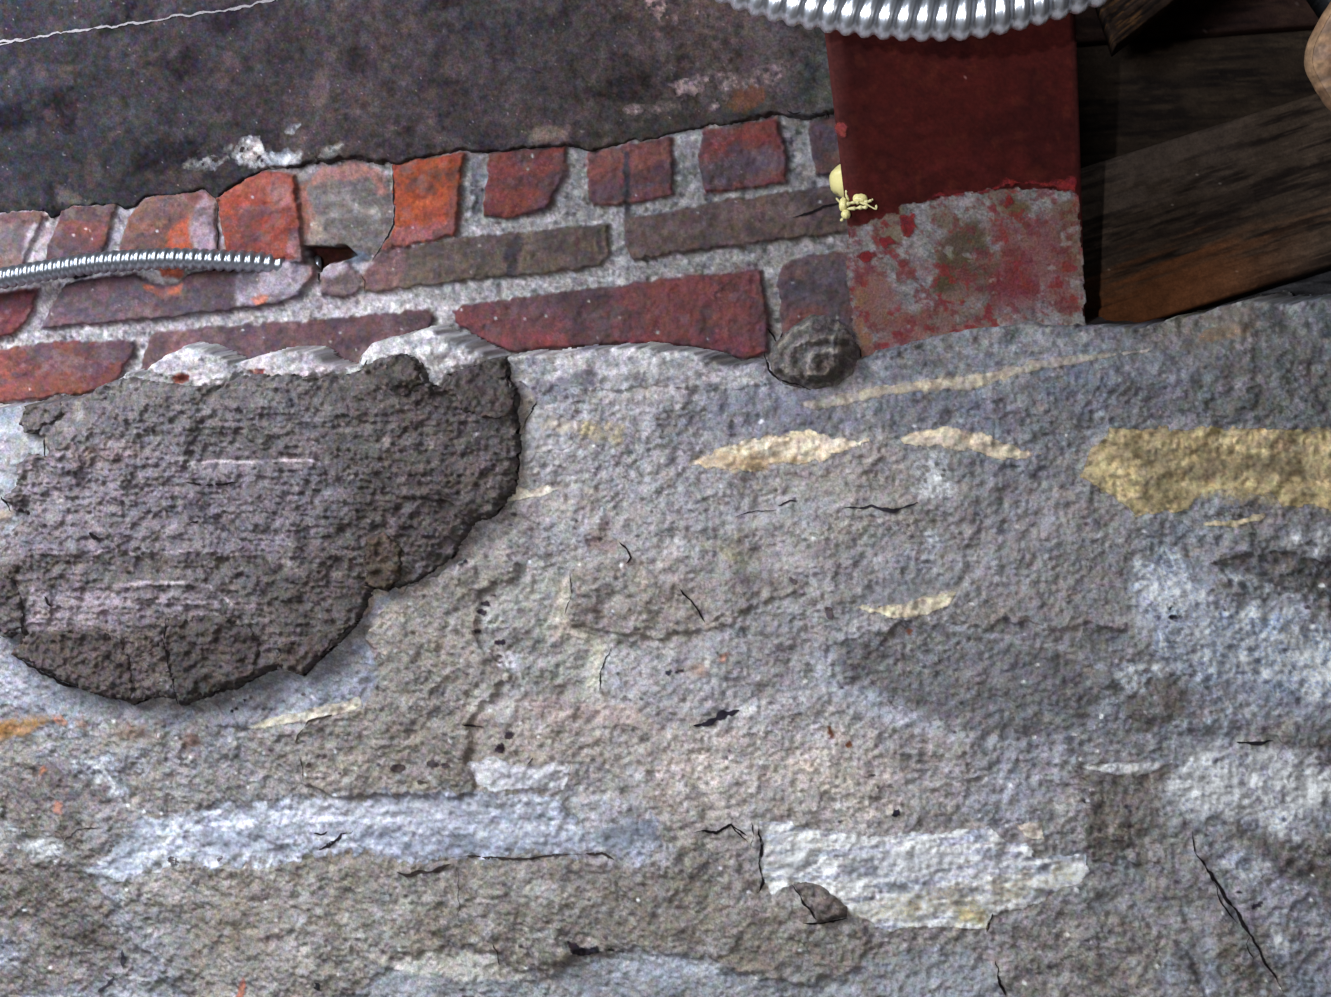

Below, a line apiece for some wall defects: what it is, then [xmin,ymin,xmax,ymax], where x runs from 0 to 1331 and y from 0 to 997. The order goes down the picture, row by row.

peeling [845,177,1086,357]
crack [1192,831,1283,991]